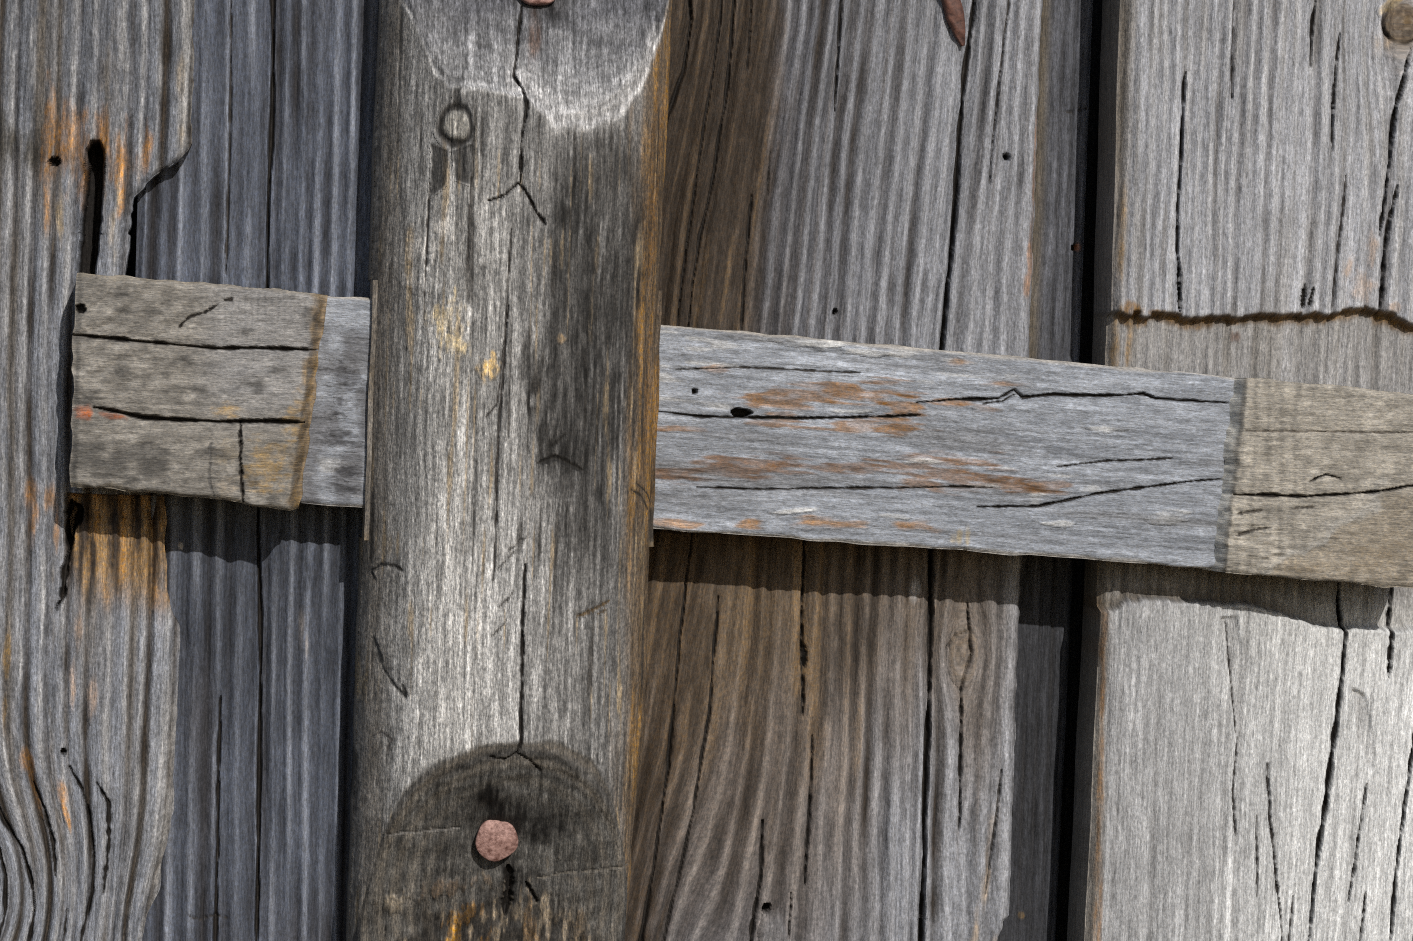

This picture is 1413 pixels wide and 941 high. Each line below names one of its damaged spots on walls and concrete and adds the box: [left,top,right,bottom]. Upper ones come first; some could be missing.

corrosion [503,0,581,81]
crack [939,0,1012,350]
crack [1175,71,1188,312]
crack [1299,0,1348,311]
crack [1374,54,1411,315]
crack [55,499,76,611]
crack [72,333,319,353]
crack [466,6,547,772]
crack [659,388,1413,435]
crack [696,456,1413,509]
crack [0,765,113,941]
crack [1224,581,1413,941]